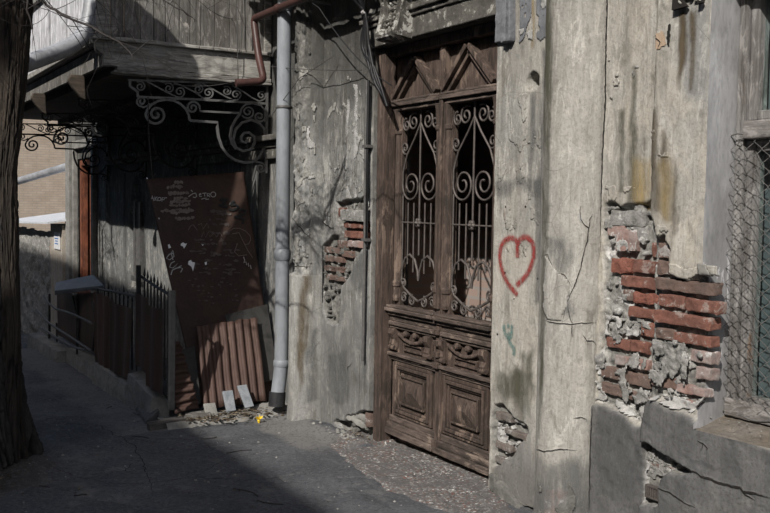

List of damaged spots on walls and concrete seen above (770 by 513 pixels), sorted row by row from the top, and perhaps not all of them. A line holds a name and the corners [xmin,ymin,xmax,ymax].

peeling [519,0,546,43]
flaking render [327,76,364,160]
spalling [292,103,371,323]
crack [544,0,609,344]
spalling [594,185,727,418]
spalling [495,411,528,464]
crack [536,407,594,512]